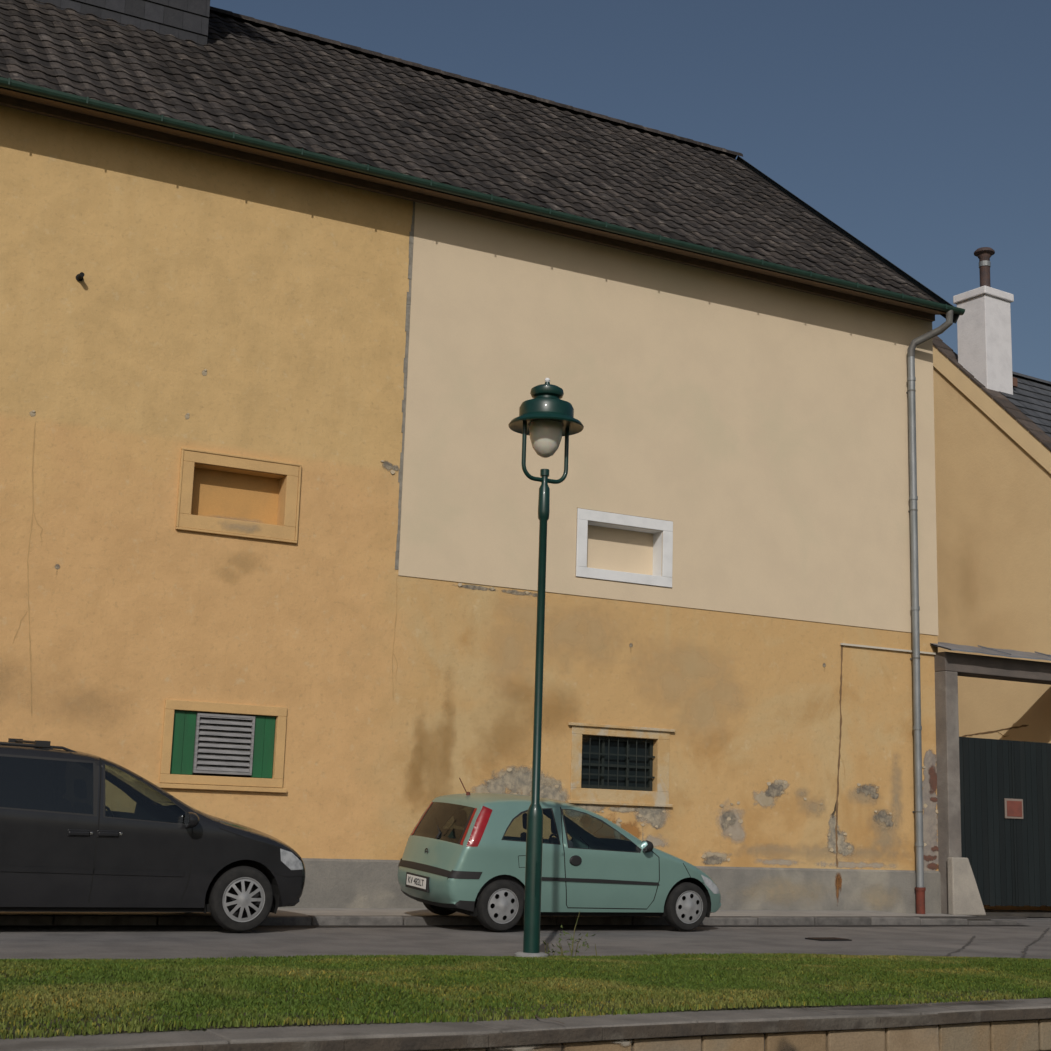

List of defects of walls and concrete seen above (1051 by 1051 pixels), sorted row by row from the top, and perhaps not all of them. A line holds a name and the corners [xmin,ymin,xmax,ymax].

crack [13,422,43,716]
crack [831,645,845,868]
spalling [474,766,665,847]
spalling [702,852,730,864]
spalling [719,801,745,841]
spalling [754,780,789,807]
spalling [827,816,853,856]
spalling [857,783,893,827]
spalling [922,750,939,871]